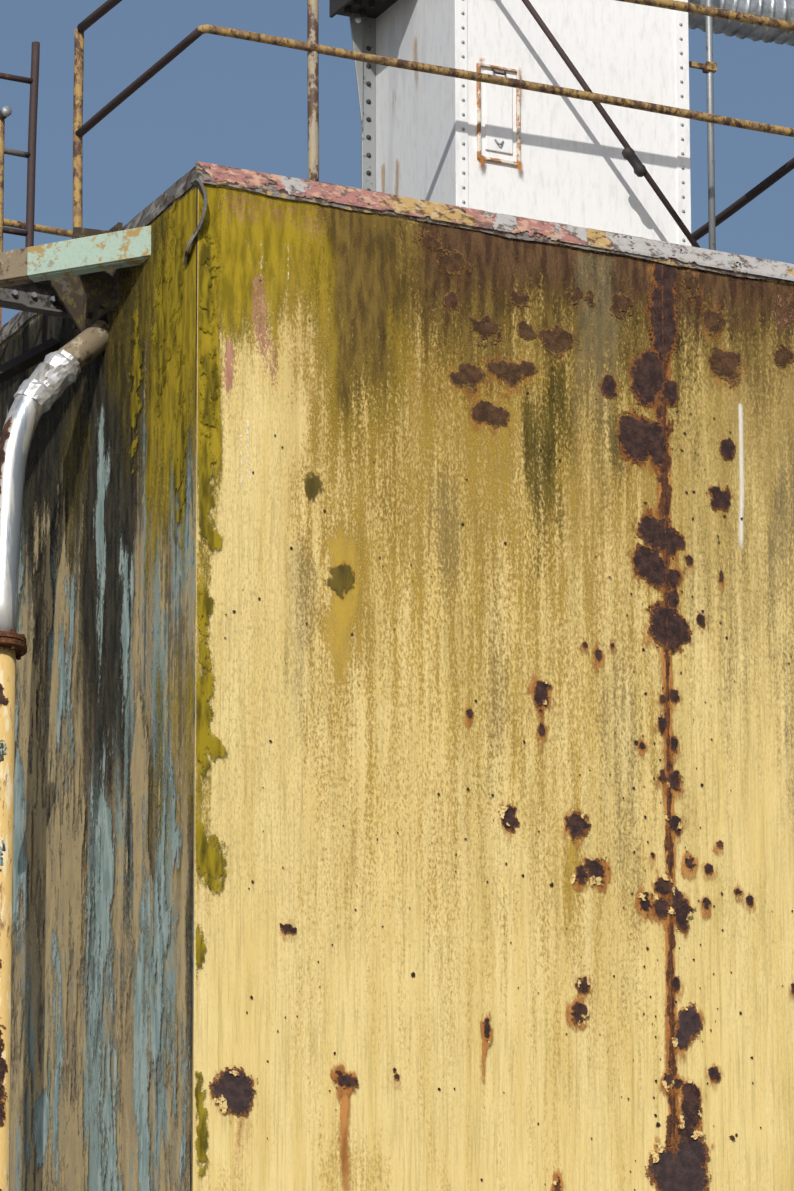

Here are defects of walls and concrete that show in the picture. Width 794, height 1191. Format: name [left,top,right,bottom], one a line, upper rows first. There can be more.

peeling [199,162,794,281]
rust [444,289,582,434]
leakage [321,205,794,601]
rust [550,809,611,929]
rust [209,1065,258,1133]
rust [329,1052,359,1190]